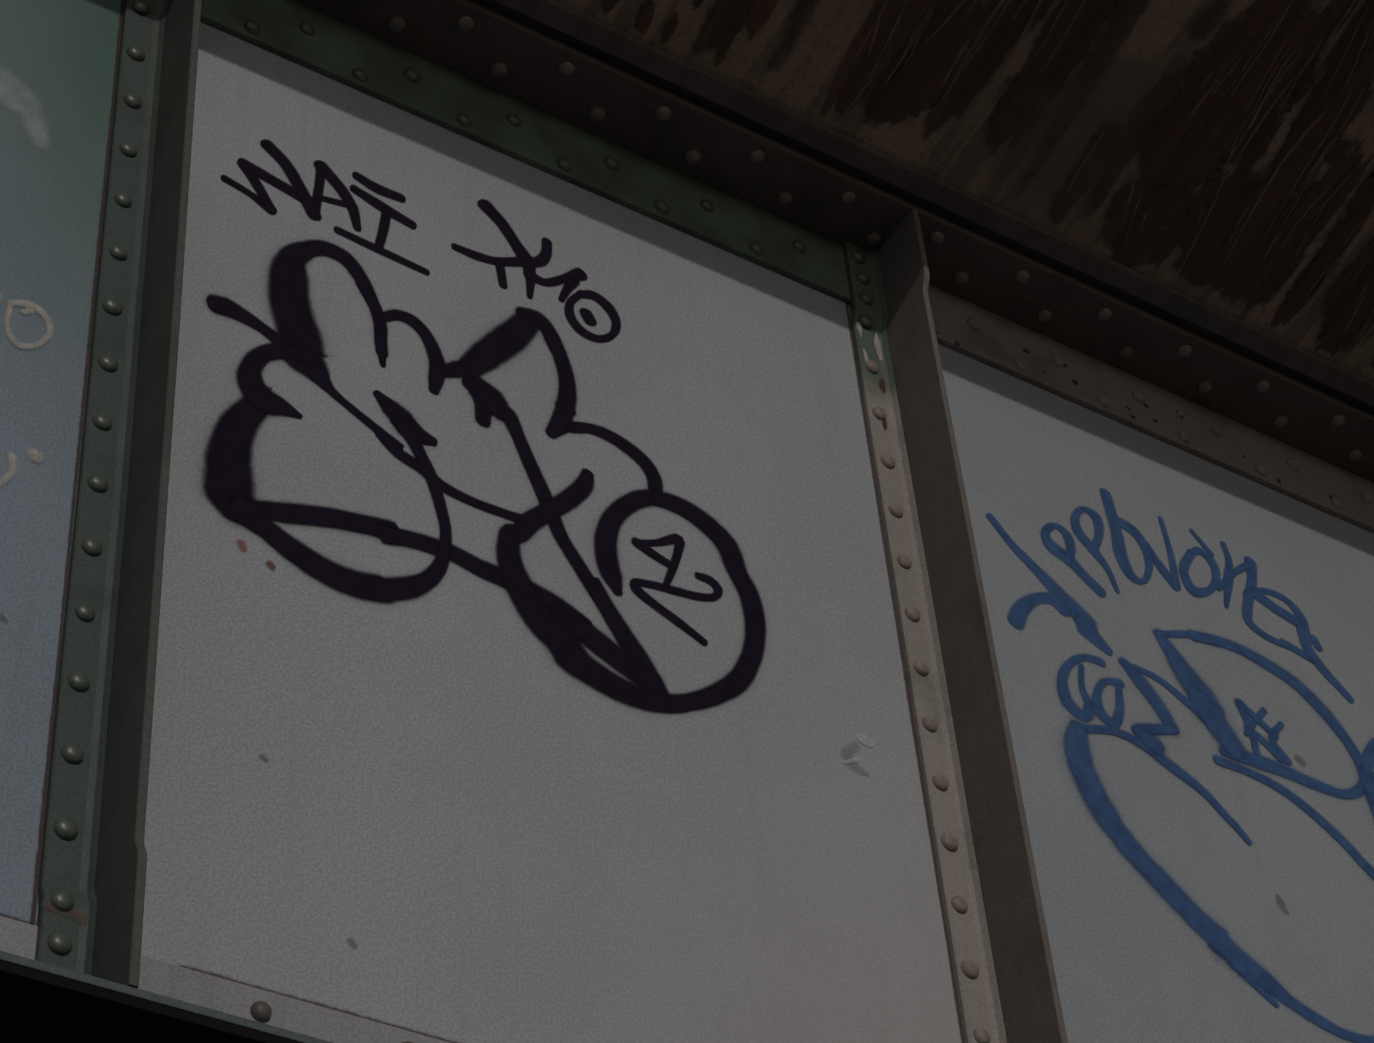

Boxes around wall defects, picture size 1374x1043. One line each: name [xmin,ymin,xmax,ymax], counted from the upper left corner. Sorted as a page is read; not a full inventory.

damp [692,0,779,66]
damp [821,0,1150,194]
damp [1049,0,1374,356]